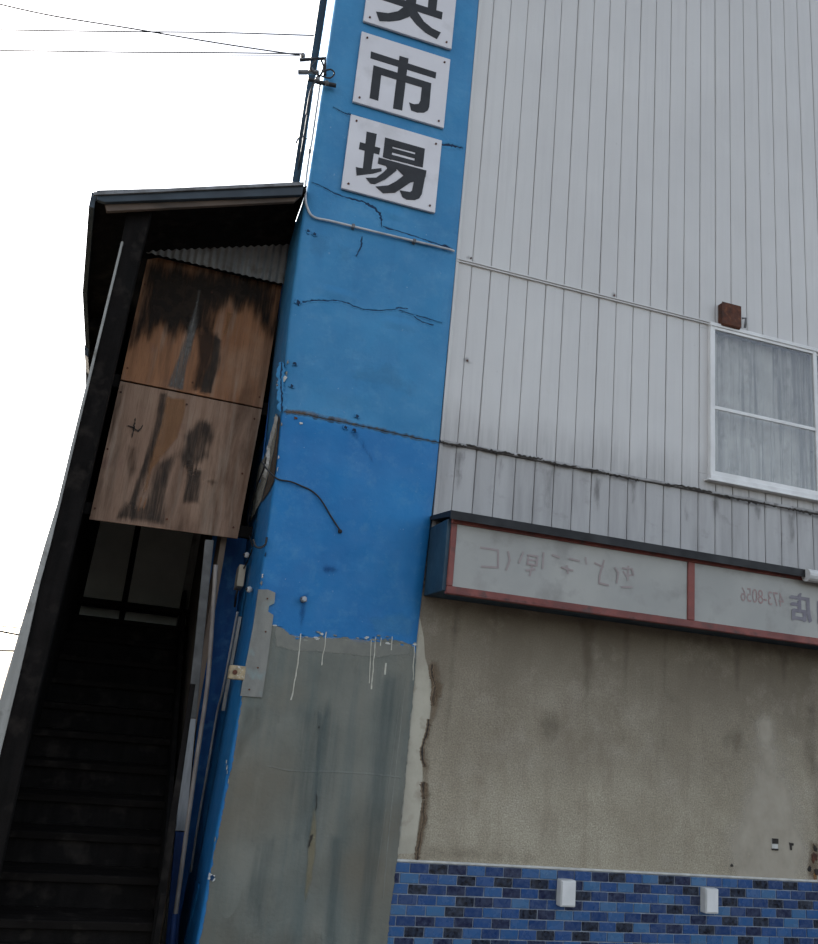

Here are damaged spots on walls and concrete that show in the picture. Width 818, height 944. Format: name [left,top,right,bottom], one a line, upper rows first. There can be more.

crack [311,181,453,257]
crack [300,297,442,327]
water stain [118,302,232,522]
spalling [250,414,282,521]
crack [276,362,639,481]
crack [665,483,818,515]
peeling [199,625,417,944]
crack [414,664,442,860]
rust [807,844,818,880]